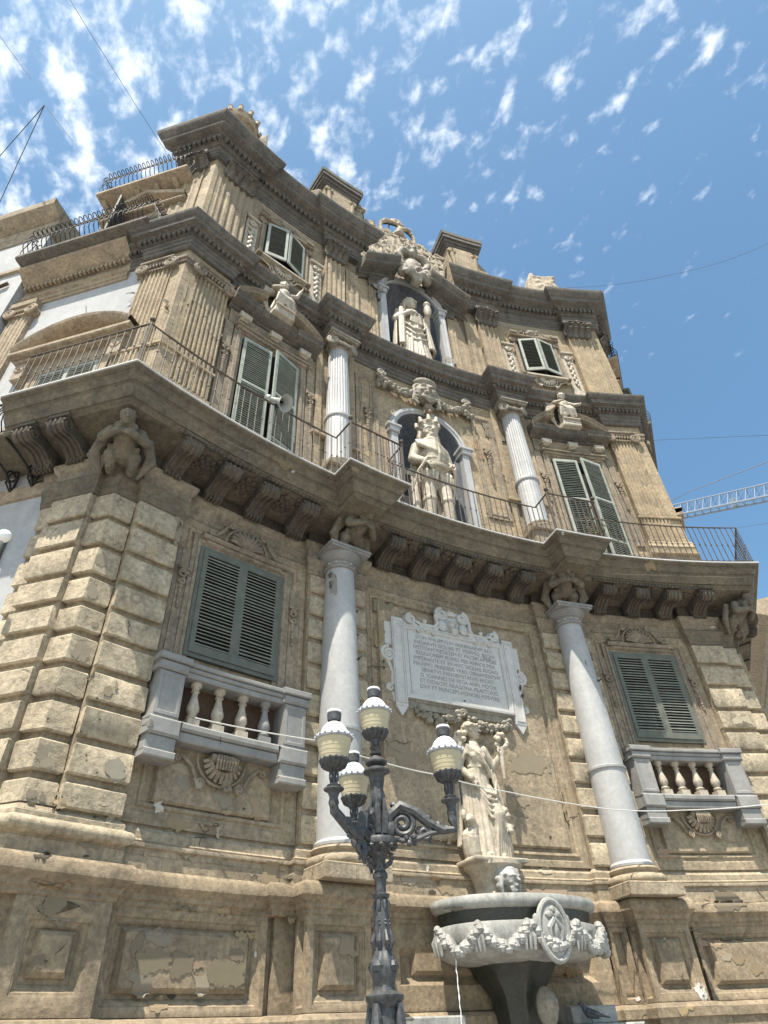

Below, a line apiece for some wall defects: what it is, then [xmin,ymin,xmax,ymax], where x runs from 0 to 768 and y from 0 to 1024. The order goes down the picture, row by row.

peeling [193,973,209,997]